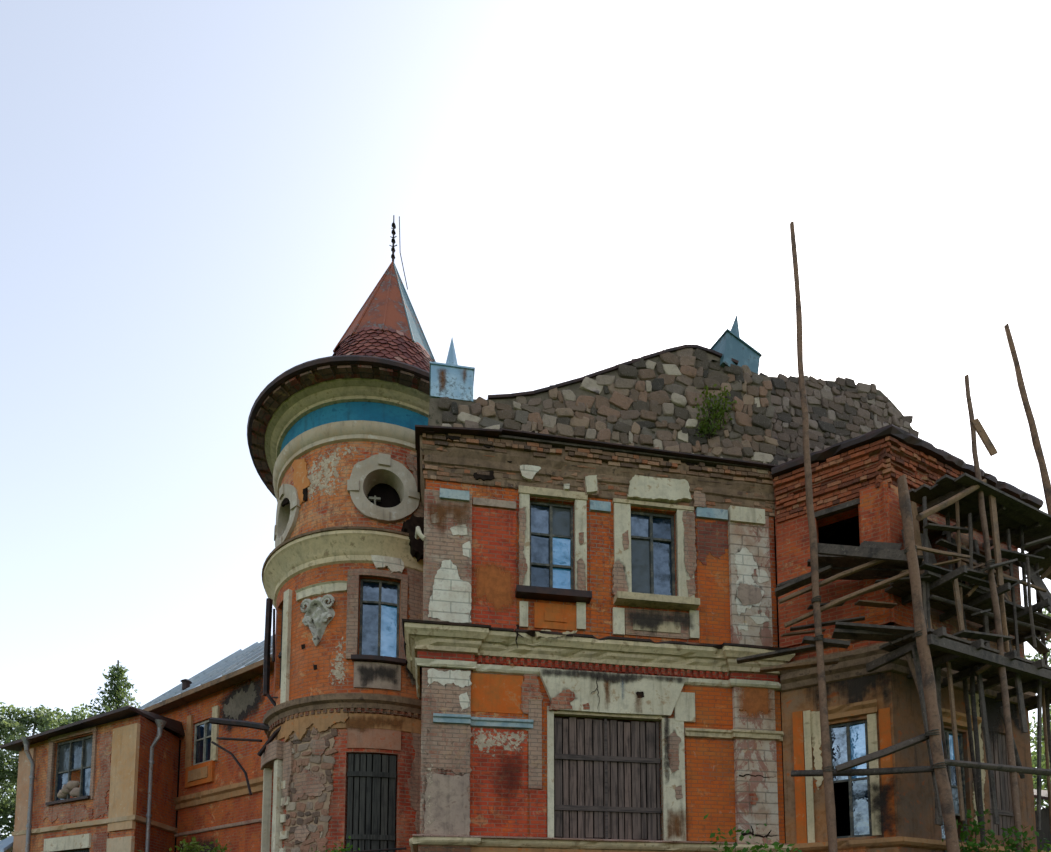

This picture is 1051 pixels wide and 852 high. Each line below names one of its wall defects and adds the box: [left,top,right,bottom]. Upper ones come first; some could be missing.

flaking render [282,441,358,507]
flaking render [583,475,599,498]
peeling [371,454,528,623]
flaking render [627,475,770,631]
peeling [406,665,472,711]
flaking render [520,674,590,714]
flaking render [284,708,349,757]
spalling [407,724,528,835]